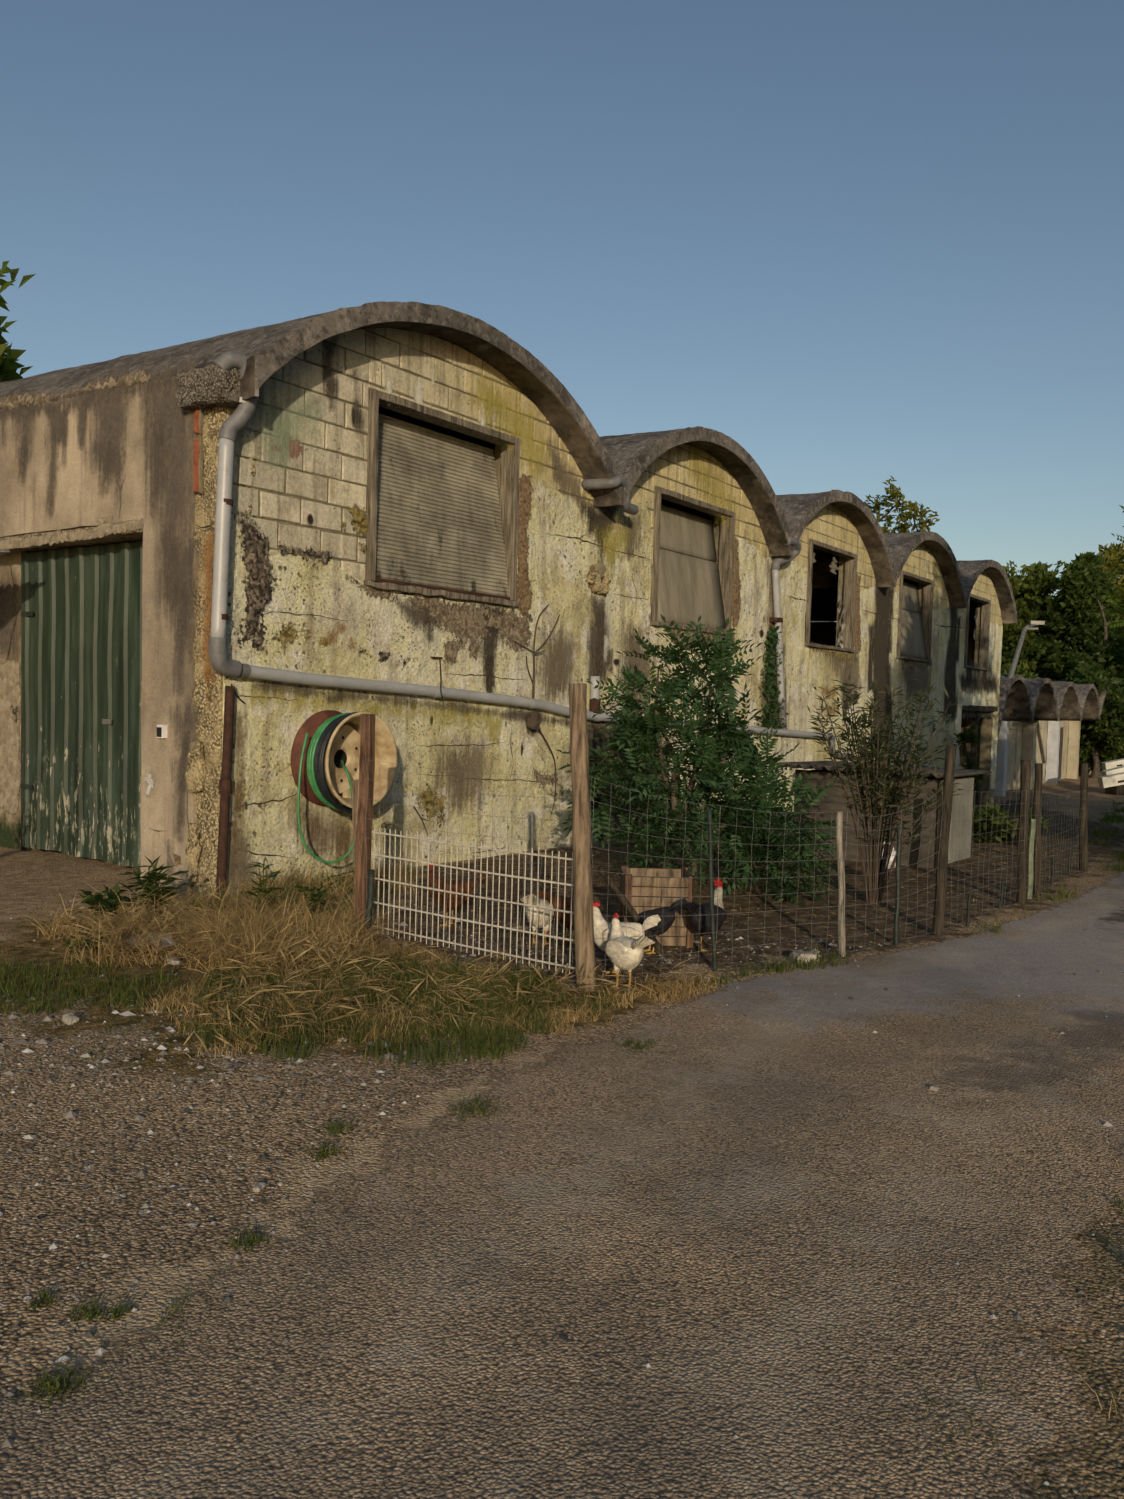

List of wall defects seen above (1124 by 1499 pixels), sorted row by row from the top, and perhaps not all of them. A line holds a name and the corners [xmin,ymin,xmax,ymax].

leakage [0,358,196,872]
spalling [237,511,335,653]
spalling [341,472,533,668]
leakage [252,596,670,843]
leakage [552,449,638,574]
leakage [830,580,998,747]